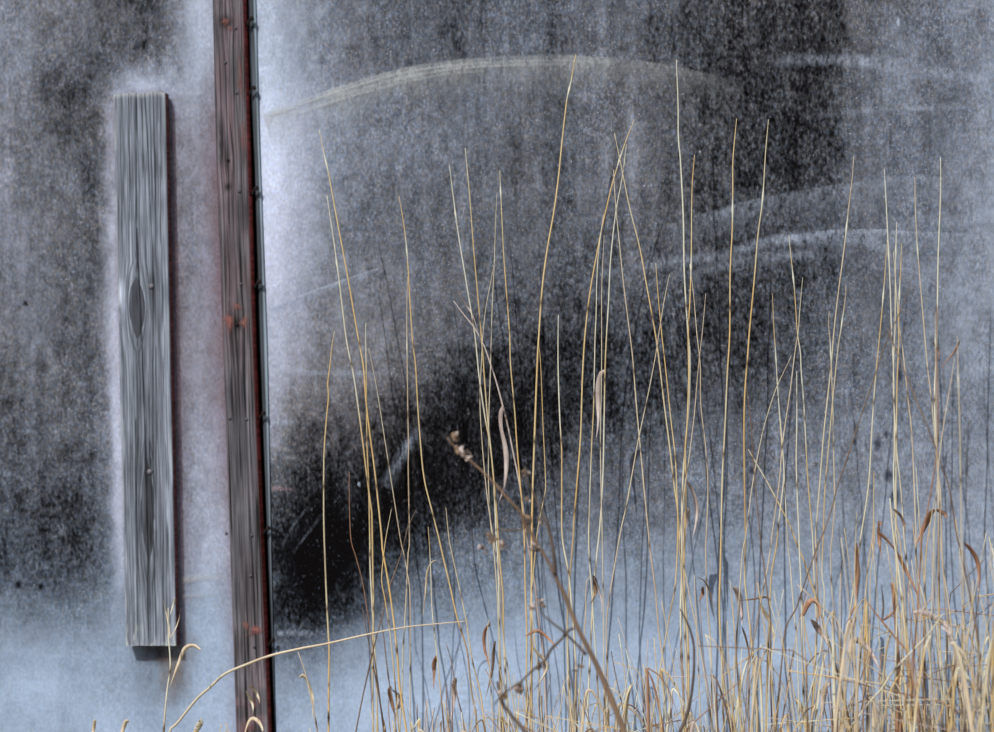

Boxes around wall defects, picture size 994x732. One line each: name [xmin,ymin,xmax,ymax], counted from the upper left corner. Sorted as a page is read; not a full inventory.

water stain [0,453,95,580]
water stain [271,0,851,632]